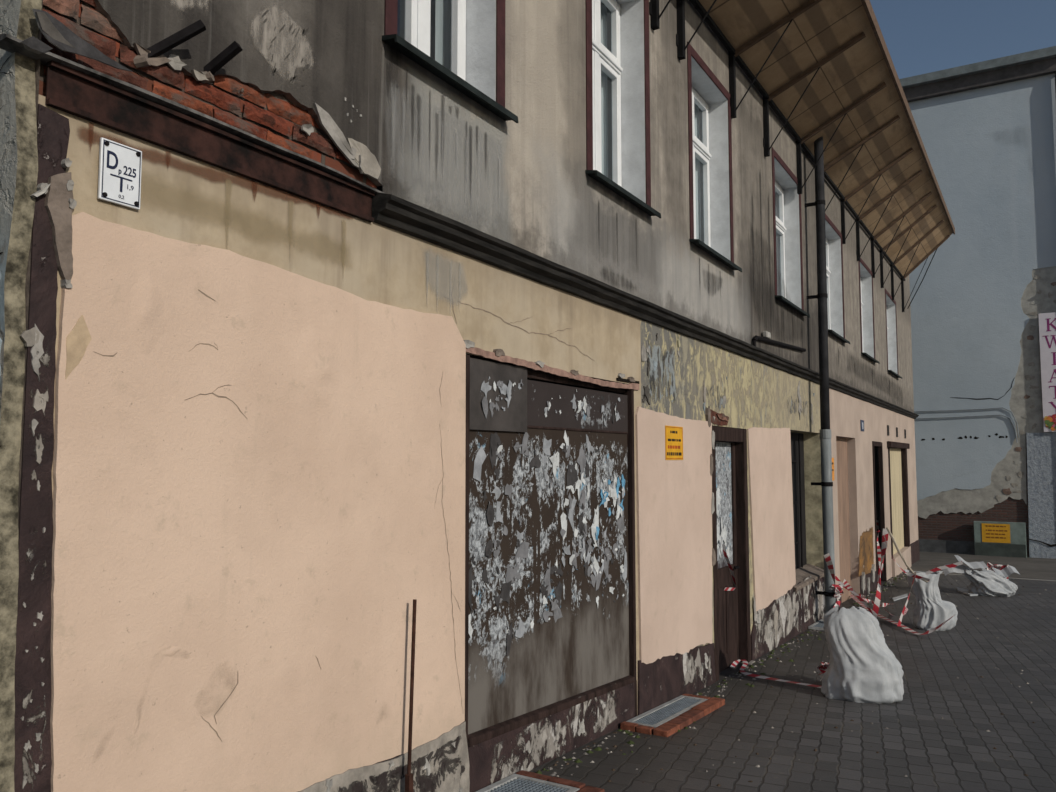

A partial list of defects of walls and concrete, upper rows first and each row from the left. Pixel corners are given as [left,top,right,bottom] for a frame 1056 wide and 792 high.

spalling [41,0,381,180]
crack [441,278,595,361]
peeling [20,324,51,491]
spalling [917,266,1056,519]
peeling [26,527,47,581]
peeling [754,575,825,651]
peeling [683,647,713,688]
peeling [20,682,46,790]
spalling [299,721,470,792]
peeling [490,683,617,784]